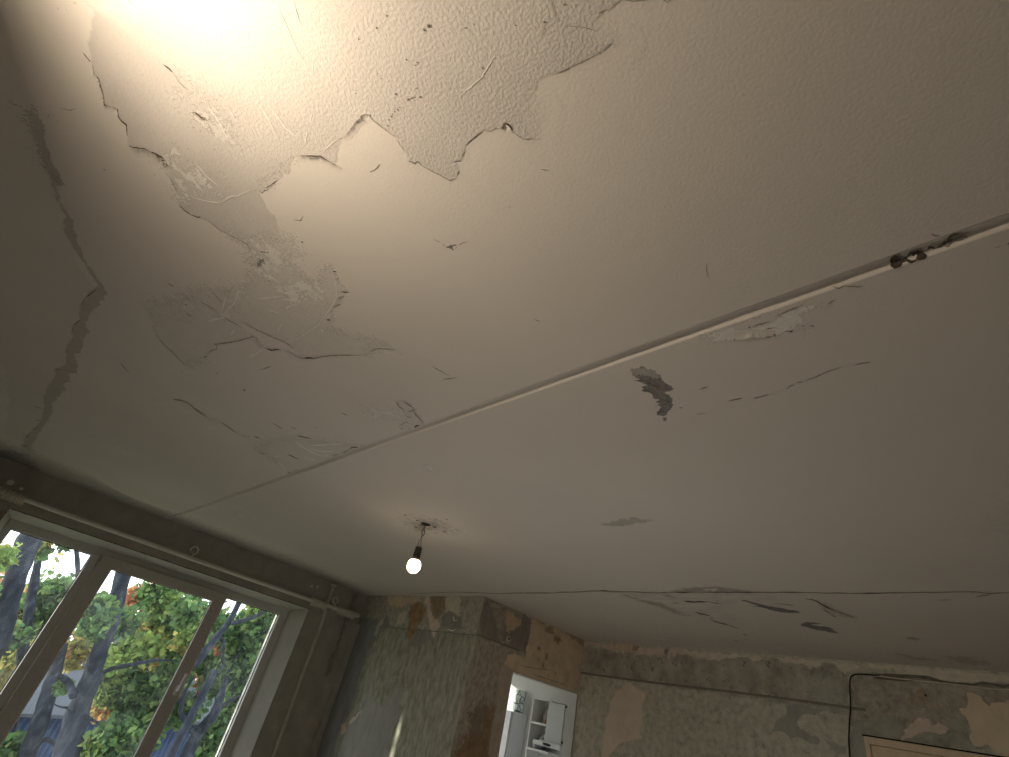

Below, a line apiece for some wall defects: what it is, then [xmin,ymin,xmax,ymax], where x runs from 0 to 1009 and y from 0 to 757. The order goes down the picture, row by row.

peeling [73,0,676,267]
peeling [8,100,108,456]
spalling [890,234,968,269]
peeling [698,285,861,345]
spalling [630,366,673,421]
peeling [476,597,532,654]
crack [411,586,1009,620]
peeling [316,614,403,757]
peeling [582,647,855,718]
peeling [959,692,1009,757]